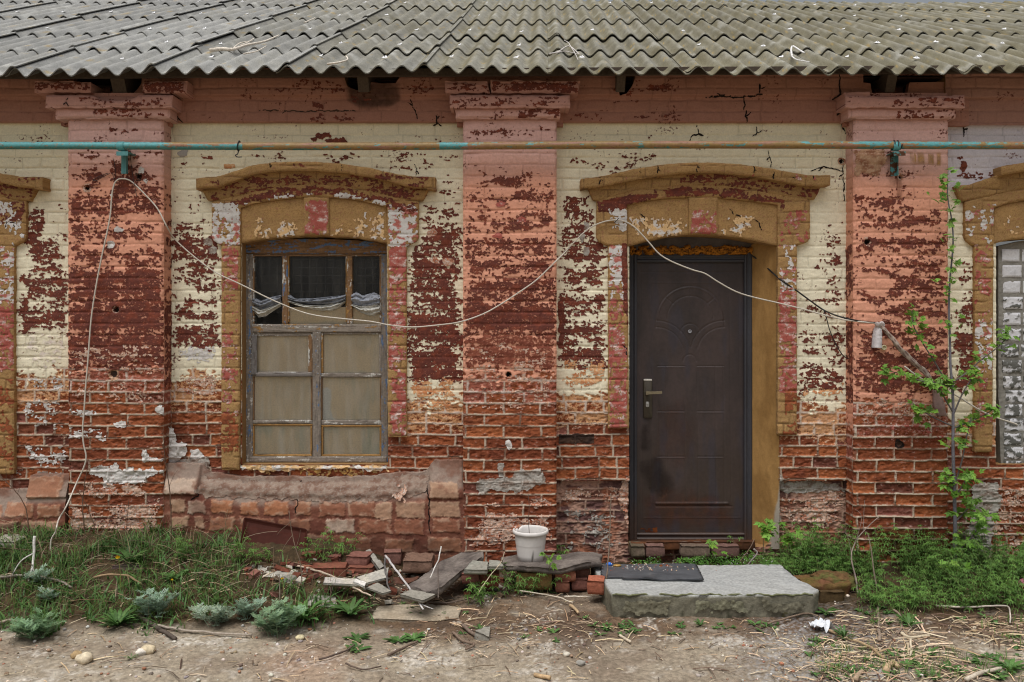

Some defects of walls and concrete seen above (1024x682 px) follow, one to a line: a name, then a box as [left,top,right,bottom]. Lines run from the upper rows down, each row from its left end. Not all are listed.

peeling [35,81,185,133]
peeling [268,79,371,163]
peeling [447,81,602,140]
crack [705,84,845,201]
peeling [892,96,964,119]
peeling [0,150,1024,475]
spalling [779,490,846,529]